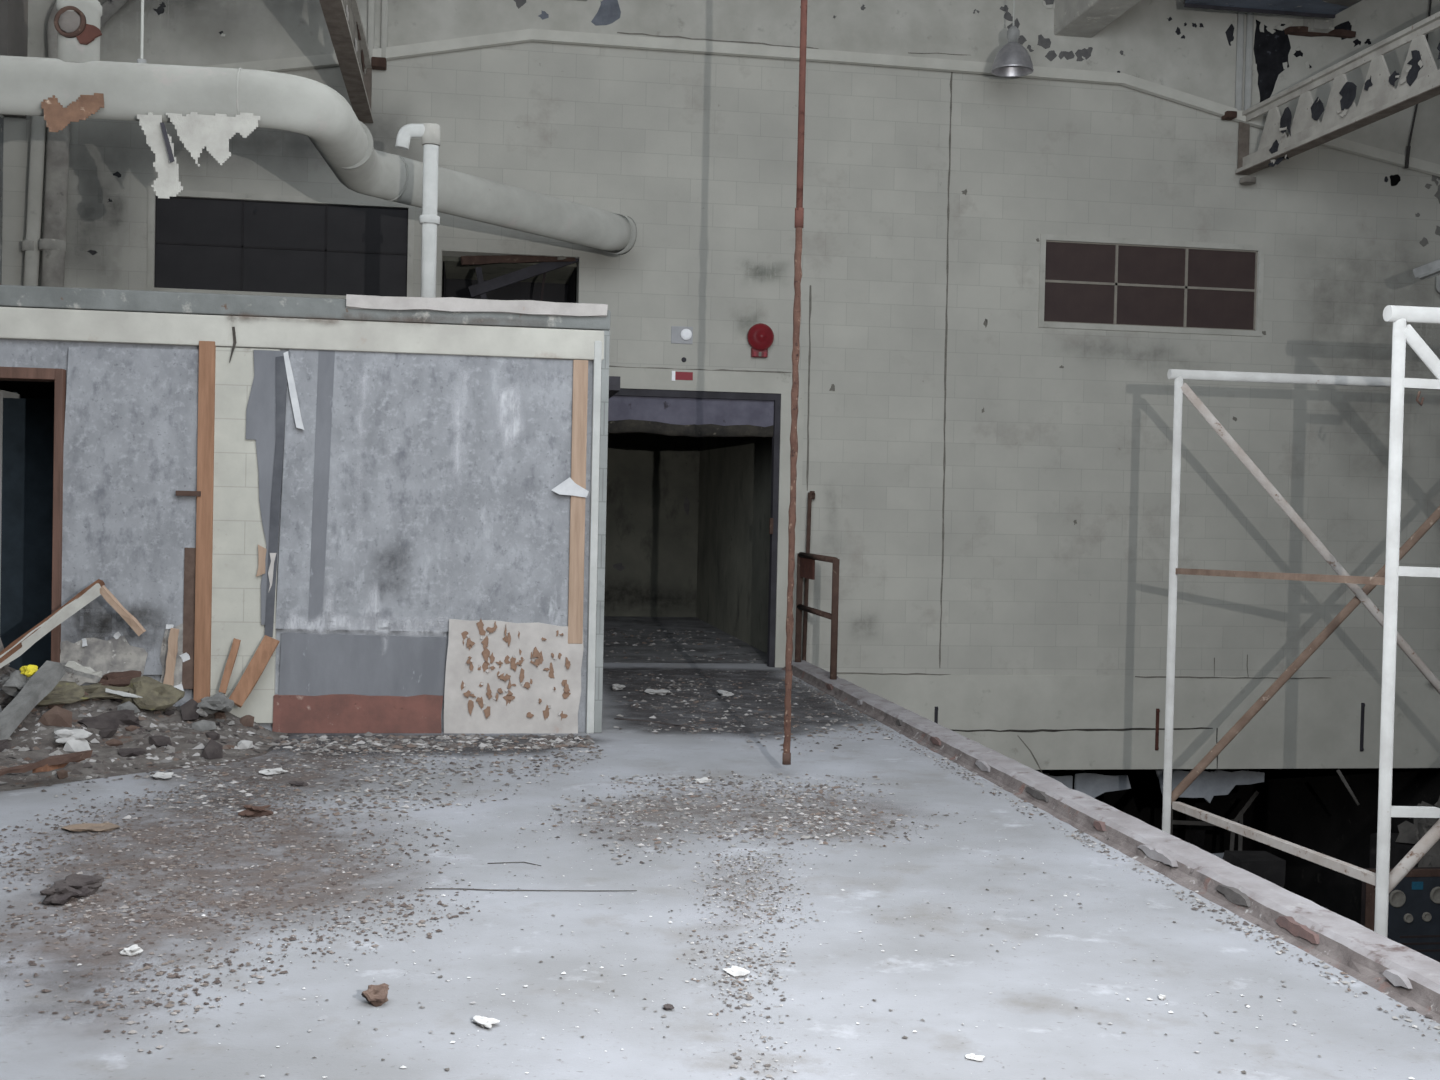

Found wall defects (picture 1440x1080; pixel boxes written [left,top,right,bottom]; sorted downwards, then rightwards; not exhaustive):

peeling [591,0,621,26]
peeling [1334,18,1371,47]
peeling [1252,13,1312,102]
peeling [1311,42,1440,121]
peeling [1269,107,1292,167]
spalling [1384,174,1401,186]
spalling [1025,768,1440,924]
spalling [1276,916,1320,944]
spalling [1383,969,1413,989]